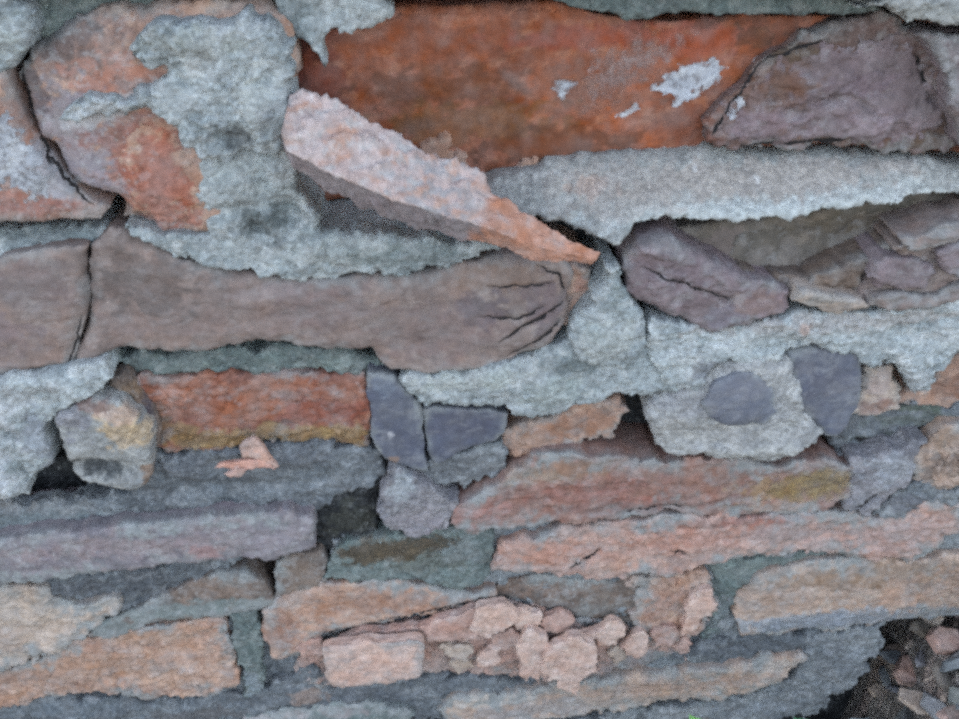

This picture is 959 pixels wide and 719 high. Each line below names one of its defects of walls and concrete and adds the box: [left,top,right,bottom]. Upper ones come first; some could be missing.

crack [69,317,82,361]